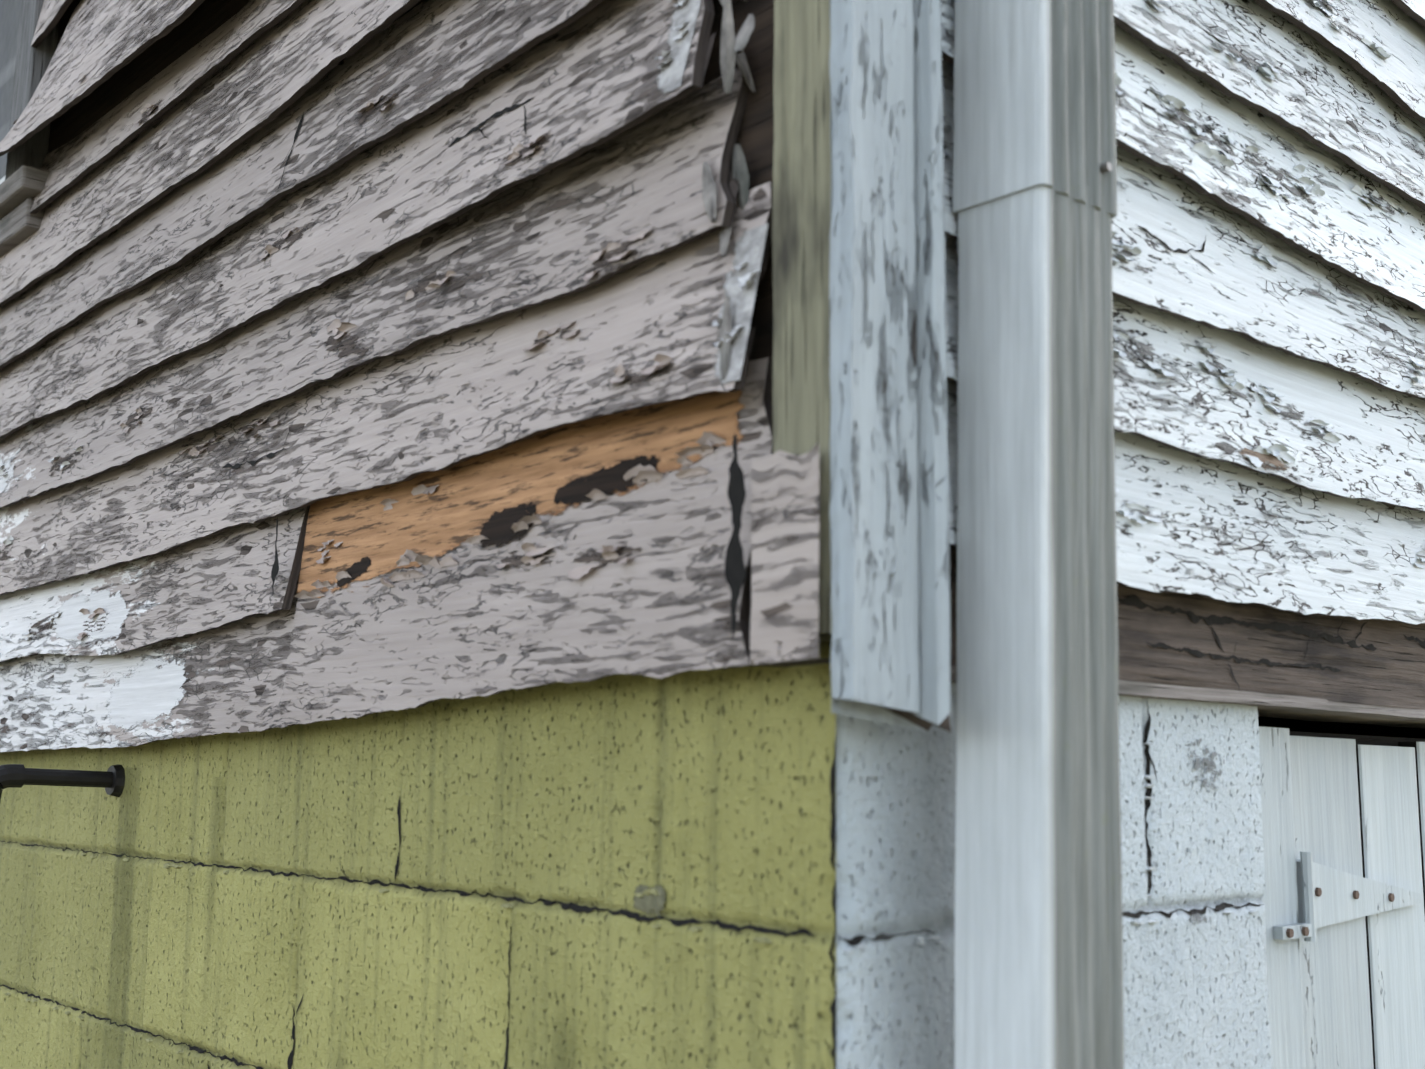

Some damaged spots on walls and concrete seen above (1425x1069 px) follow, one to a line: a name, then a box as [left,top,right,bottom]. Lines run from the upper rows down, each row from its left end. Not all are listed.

peeling [1361,38,1390,61]
peeling [1150,87,1325,215]
peeling [1112,231,1153,284]
peeling [1113,329,1177,376]
peeling [1197,342,1342,443]
peeling [48,445,84,477]
peeling [293,390,745,599]
peeling [1239,443,1296,473]
peeling [23,589,130,645]
crack [1117,594,1425,691]
peeling [106,656,187,730]
crack [1122,711,1264,925]